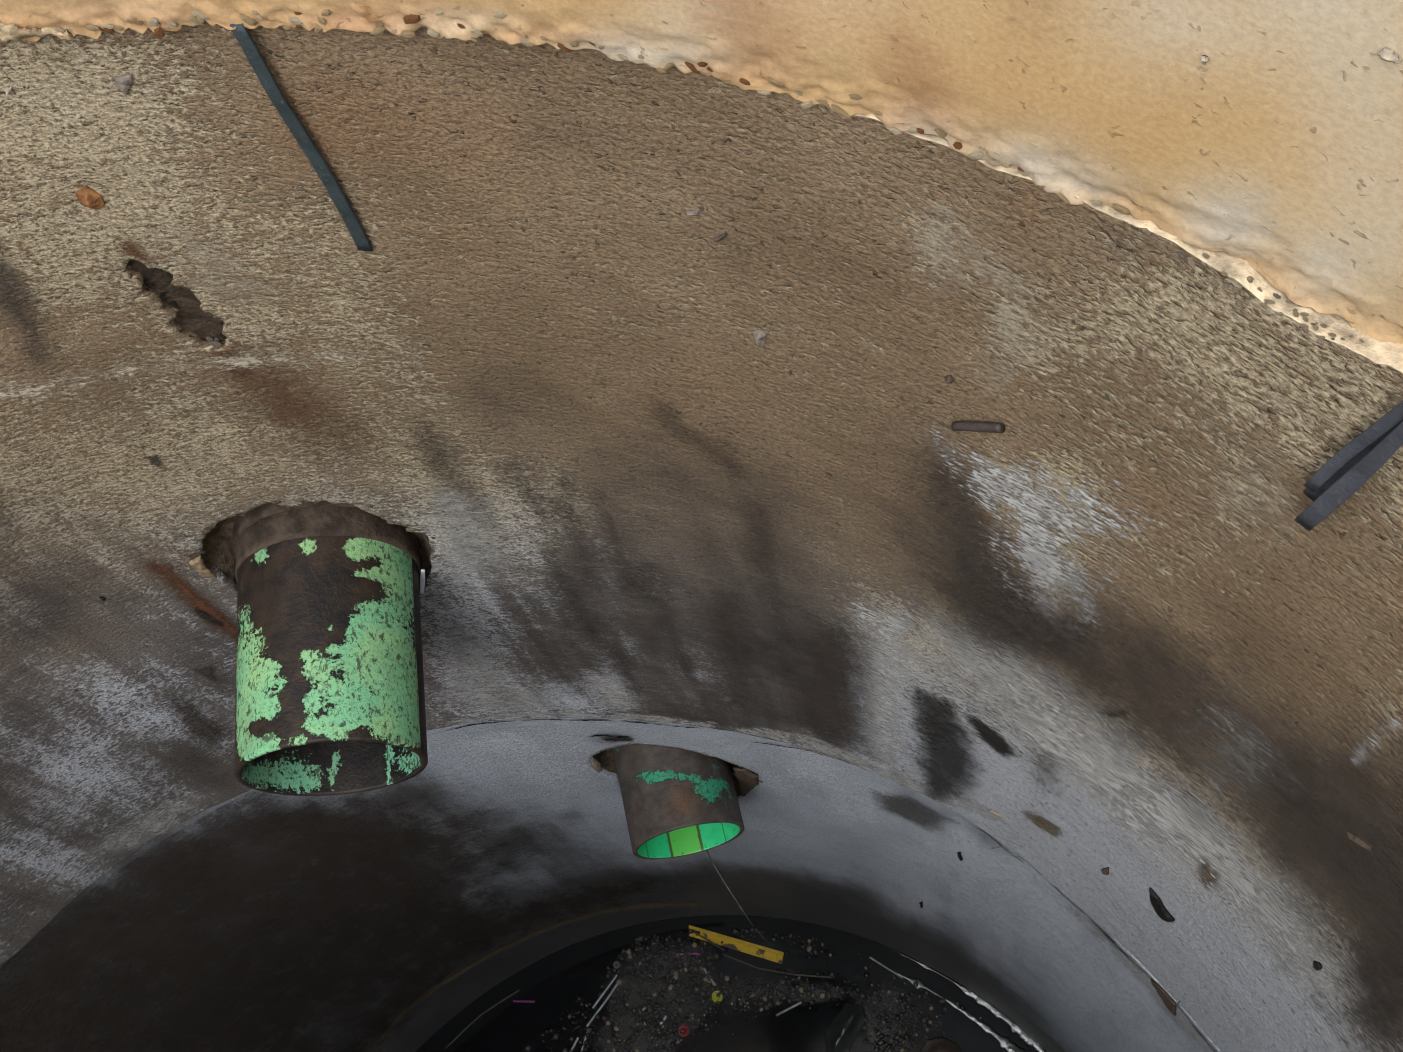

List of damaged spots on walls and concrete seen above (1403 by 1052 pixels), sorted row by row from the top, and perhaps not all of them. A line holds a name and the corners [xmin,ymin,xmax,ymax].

spalling [127,260,227,354]
rust [148,562,237,640]
leakage [448,671,715,729]
leakage [735,430,1403,1011]